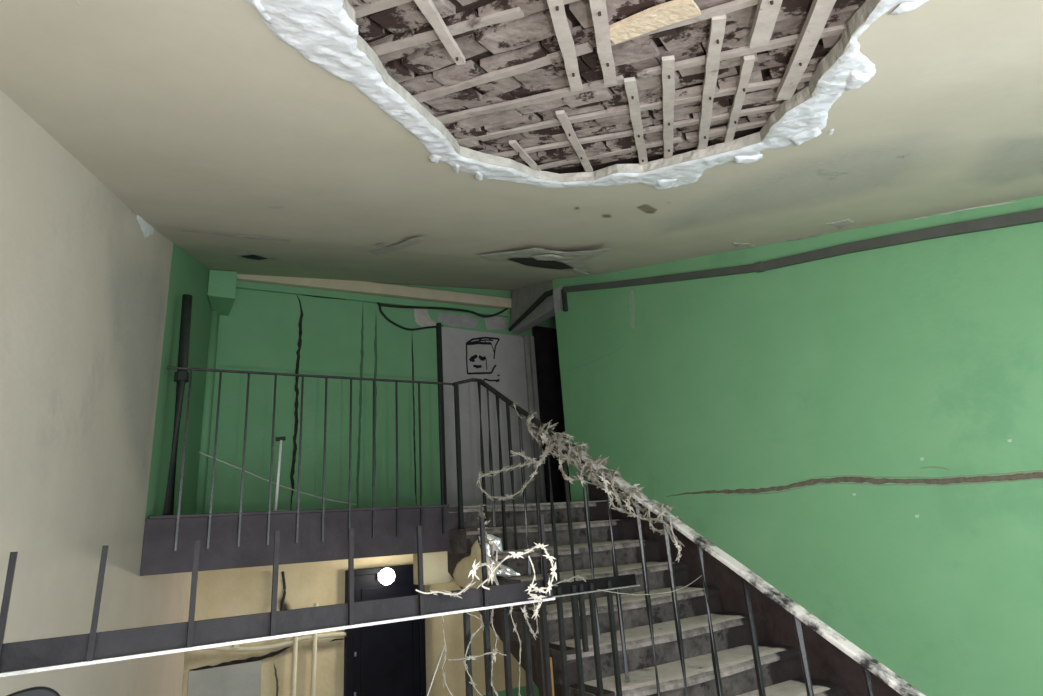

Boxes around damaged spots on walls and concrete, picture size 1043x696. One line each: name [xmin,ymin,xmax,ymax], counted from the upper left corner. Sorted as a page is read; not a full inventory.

flaking render [246,0,929,190]
crack [290,295,304,510]
crack [666,466,1043,497]
crack [189,646,291,696]